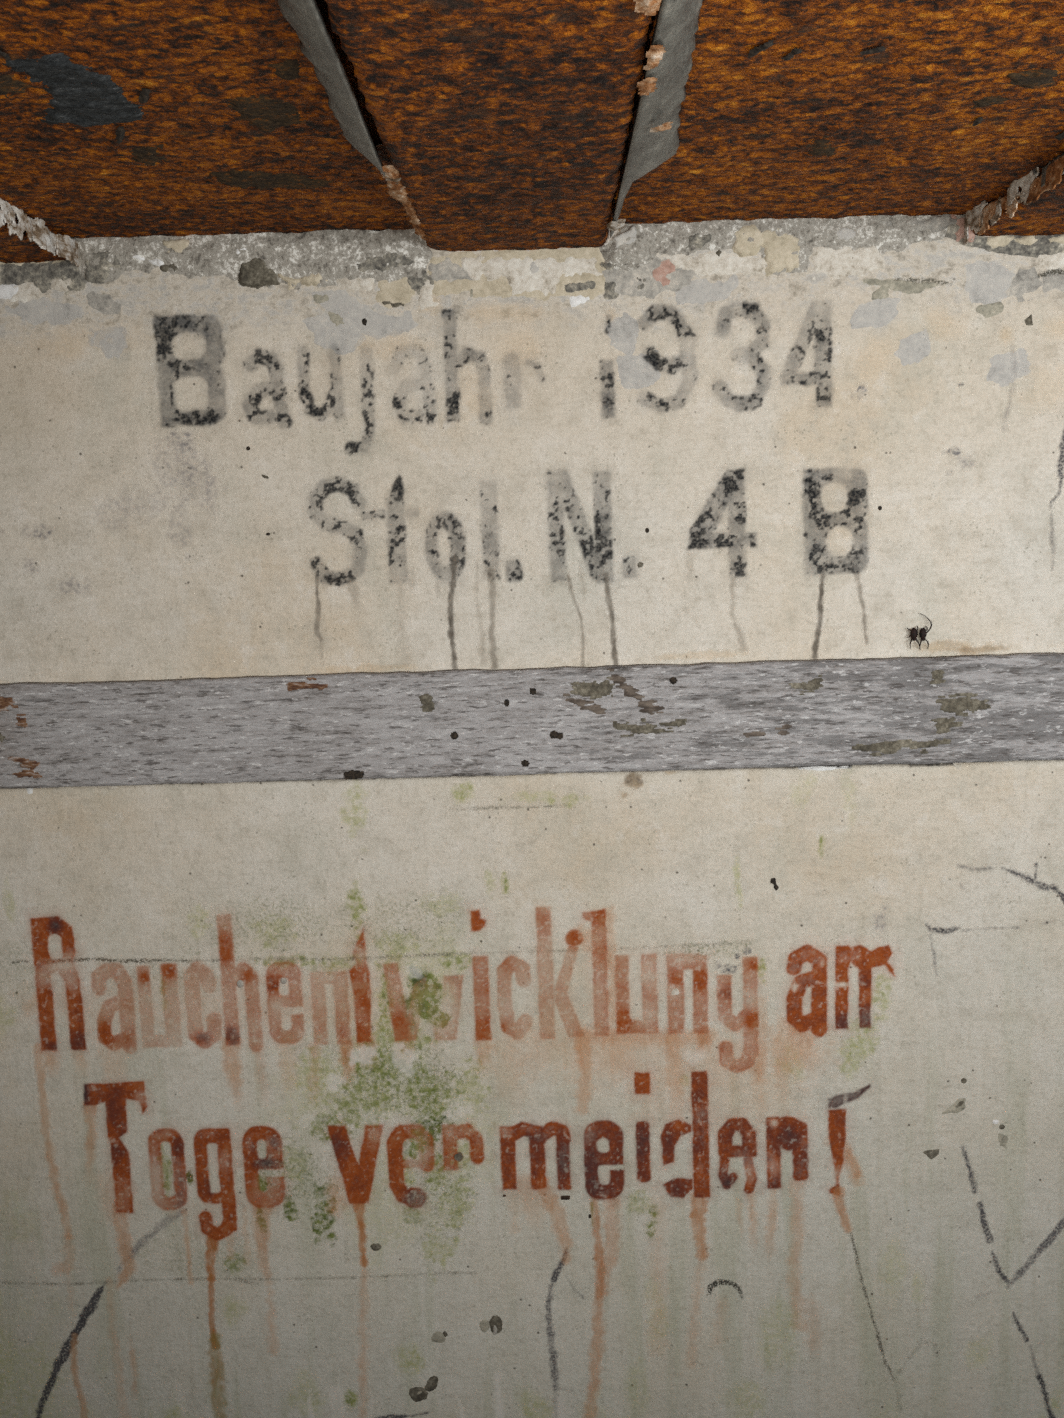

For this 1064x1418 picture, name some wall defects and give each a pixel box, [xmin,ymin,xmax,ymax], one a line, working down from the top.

peeling [633,0,661,16]
peeling [637,45,666,96]
peeling [650,122,673,132]
flaking render [0,153,1064,390]
leakage [354,1203,367,1267]